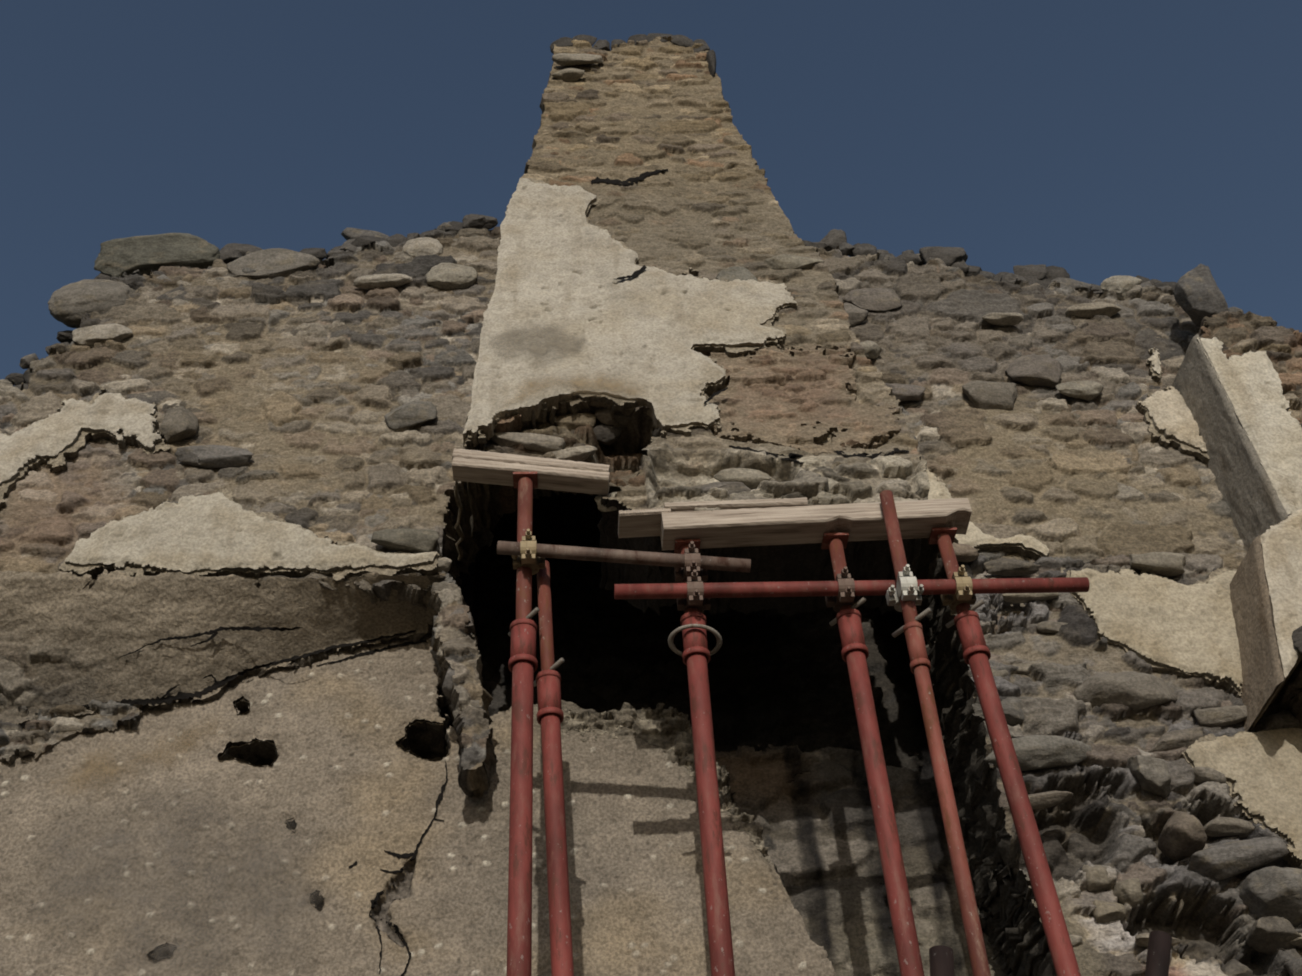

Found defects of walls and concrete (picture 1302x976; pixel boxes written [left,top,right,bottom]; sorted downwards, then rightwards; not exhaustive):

peeling [463,178,902,456]
peeling [0,387,171,510]
peeling [920,455,953,500]
peeling [1135,347,1210,464]
peeling [59,488,439,584]
peeling [953,521,1049,560]
crack [82,626,427,709]
peeling [1060,567,1243,698]
spalling [217,738,279,767]
spalling [395,719,451,761]
crack [349,761,448,976]